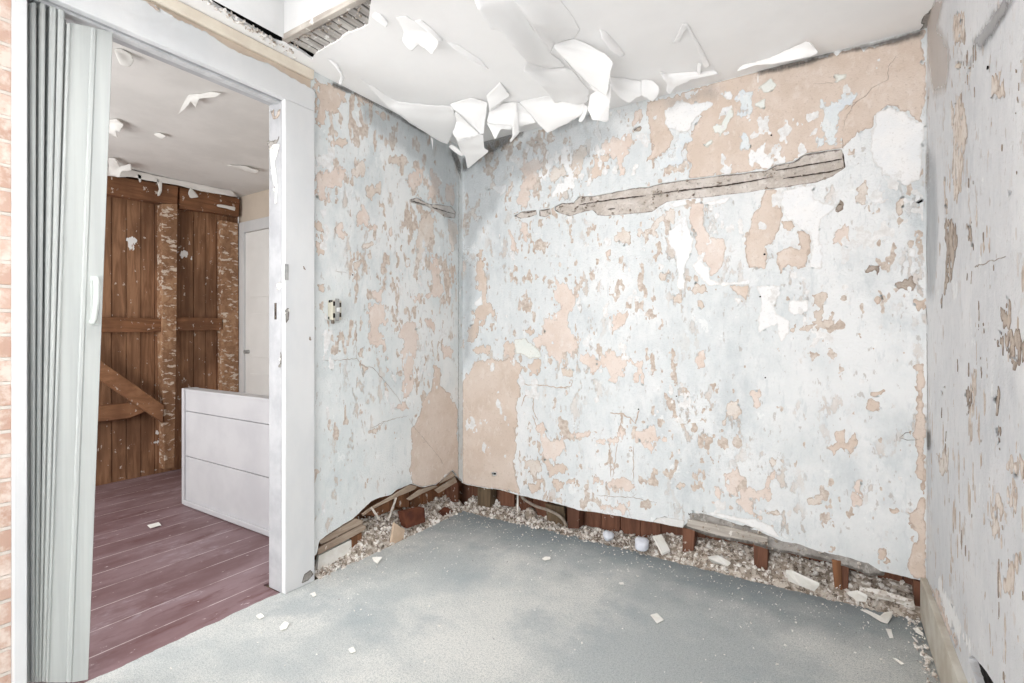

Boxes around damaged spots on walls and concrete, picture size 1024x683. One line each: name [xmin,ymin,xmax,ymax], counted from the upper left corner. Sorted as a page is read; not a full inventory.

peeling [109,119,124,138]
peeling [179,92,222,114]
crack [801,60,894,157]
peeling [938,11,990,308]
peeling [991,60,1022,114]
peeling [309,0,933,576]
peeling [879,295,1024,683]